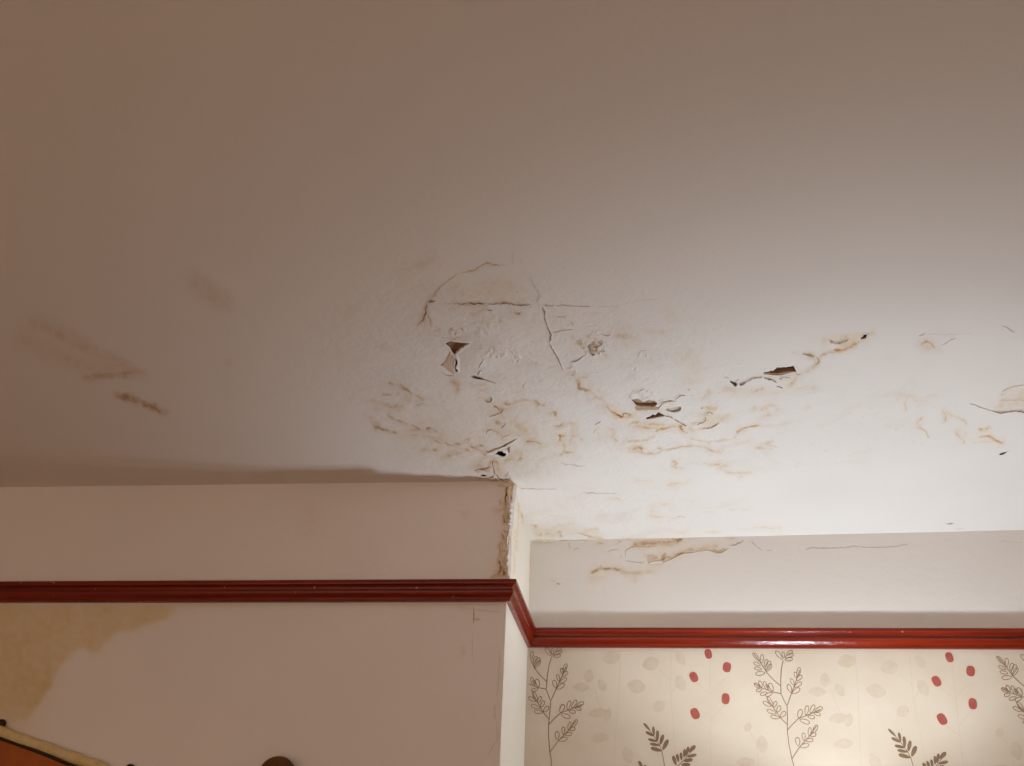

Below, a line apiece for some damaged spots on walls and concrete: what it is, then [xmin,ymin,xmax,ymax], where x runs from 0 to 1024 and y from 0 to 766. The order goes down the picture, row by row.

crack [415,262,590,370]
spalling [433,334,472,377]
spalling [760,353,819,387]
spalling [628,395,683,421]
spalling [488,439,517,459]